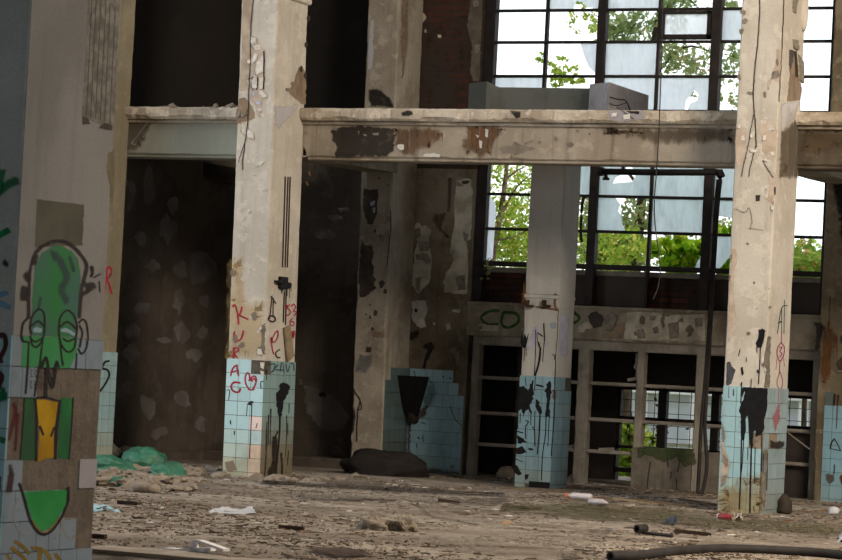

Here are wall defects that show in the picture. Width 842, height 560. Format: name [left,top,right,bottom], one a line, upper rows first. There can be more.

spalling [235,0,268,140]
peeling [275,66,307,128]
peeling [331,125,404,158]